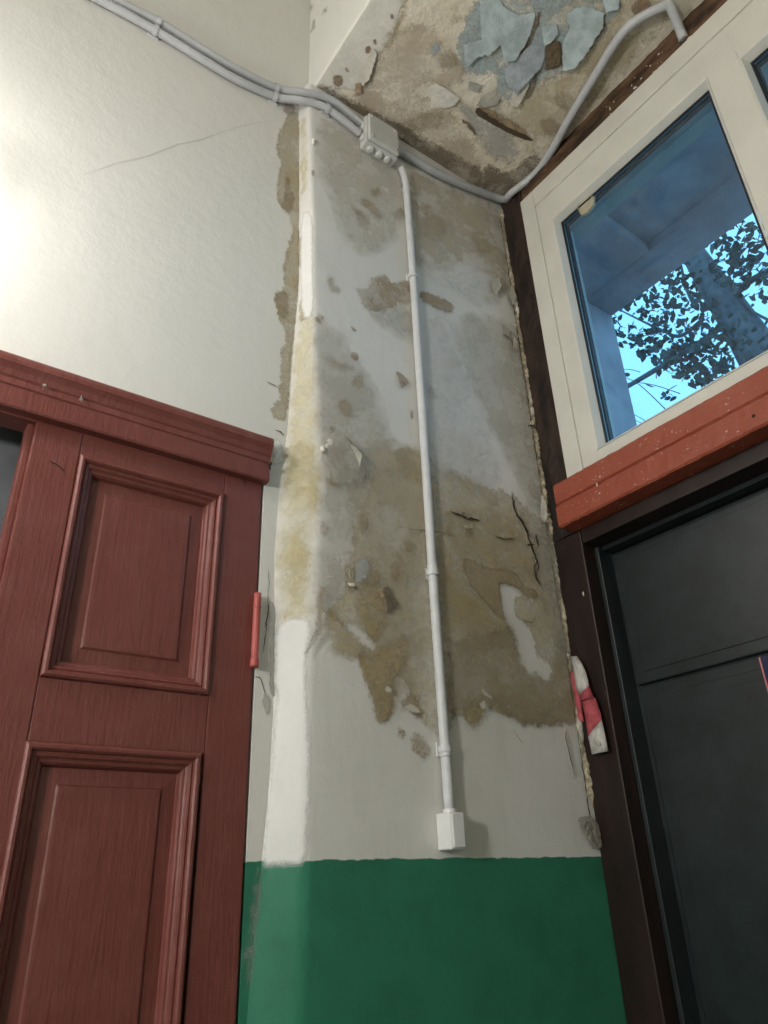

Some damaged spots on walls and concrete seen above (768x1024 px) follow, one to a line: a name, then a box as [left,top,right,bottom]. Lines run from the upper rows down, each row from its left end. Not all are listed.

peeling [355,49,377,95]
peeling [428,0,651,141]
leakage [276,115,306,211]
leakage [325,131,509,288]
leakage [271,225,576,758]
crack [398,492,541,586]